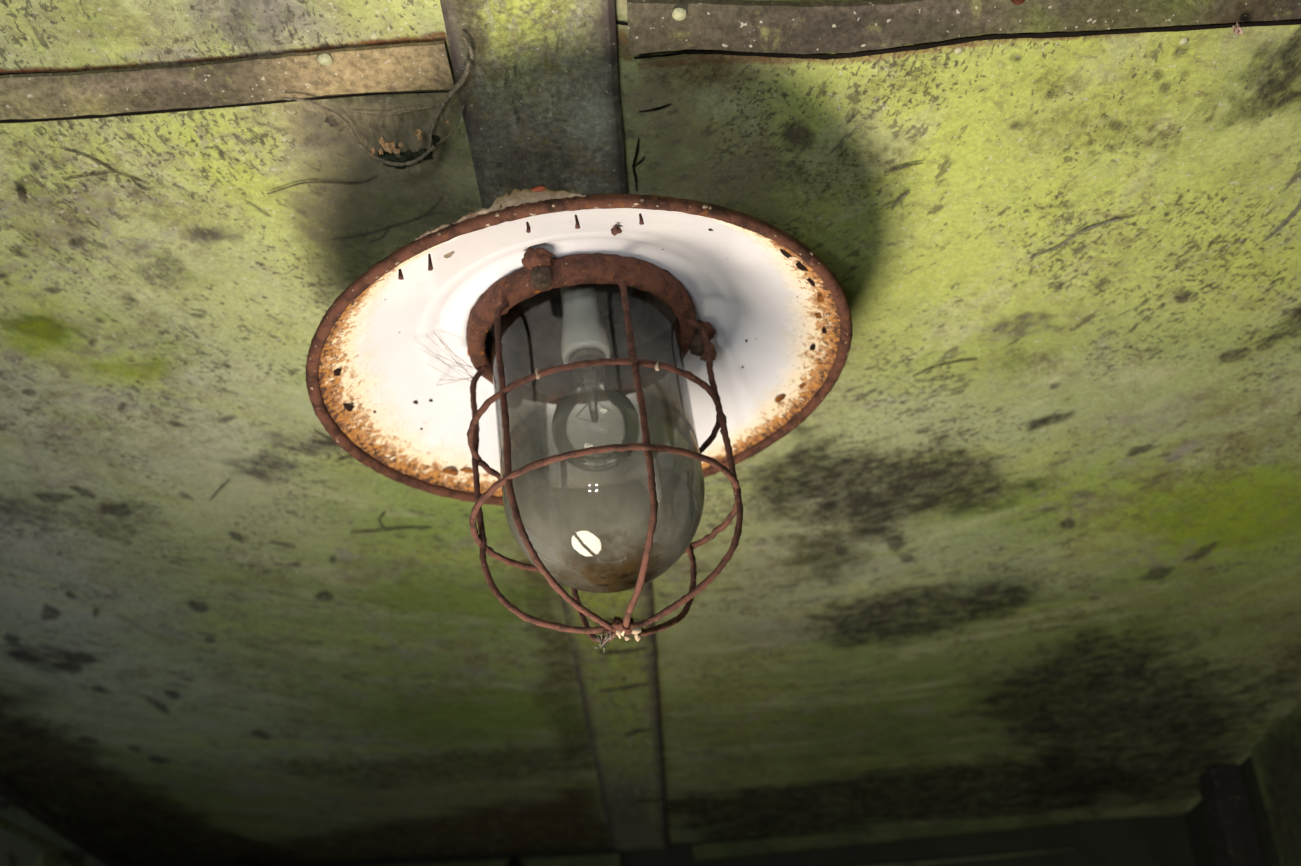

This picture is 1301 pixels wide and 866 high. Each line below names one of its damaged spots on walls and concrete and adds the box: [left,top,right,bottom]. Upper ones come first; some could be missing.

damp [1250,35,1301,115]
damp [1029,414,1070,432]
damp [753,441,1035,579]
damp [808,580,1036,647]
damp [0,696,291,866]
damp [666,631,1301,839]